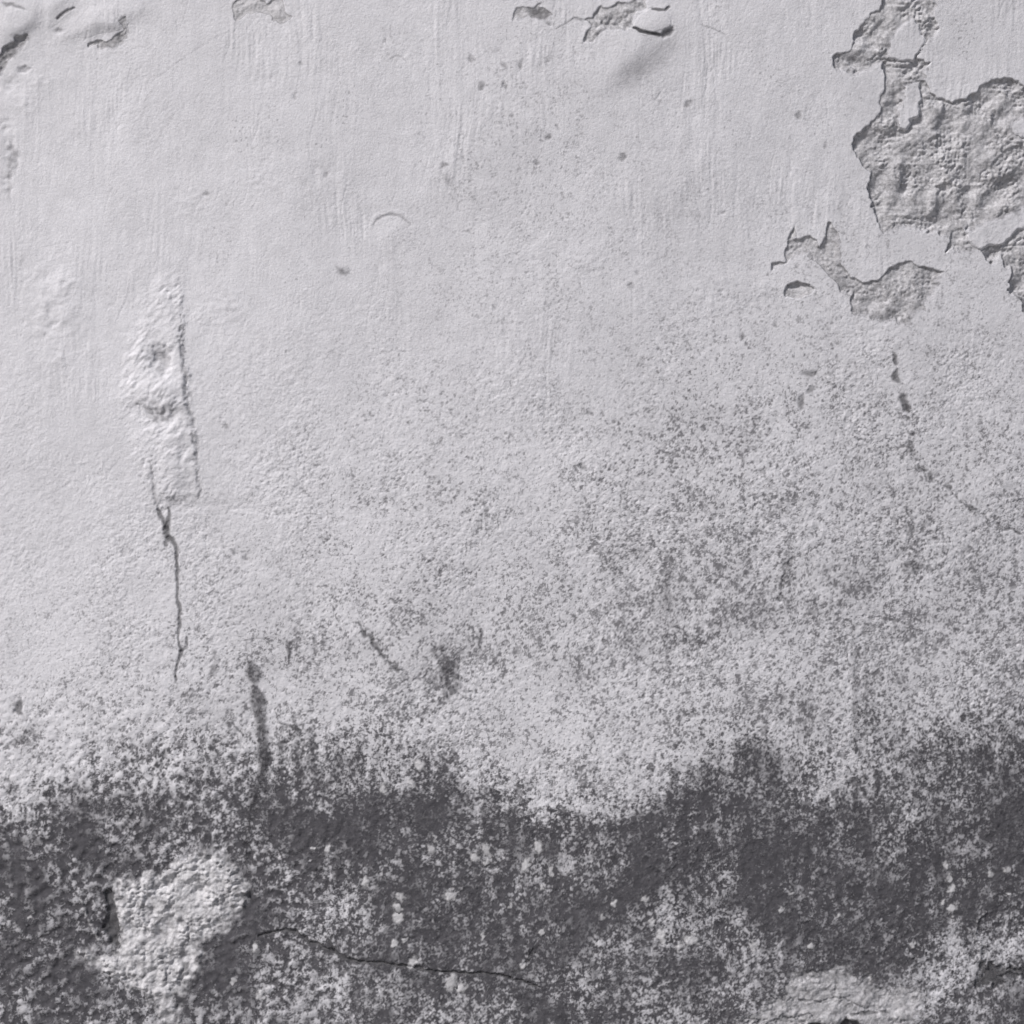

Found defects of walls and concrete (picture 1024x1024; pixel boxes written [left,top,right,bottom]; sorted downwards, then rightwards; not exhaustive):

peeling [0,34,29,74]
peeling [88,17,127,49]
peeling [513,3,552,20]
peeling [584,0,672,42]
spalling [833,0,1024,313]
spalling [772,223,943,325]
leakage [0,662,1024,1024]
crack [258,928,542,988]